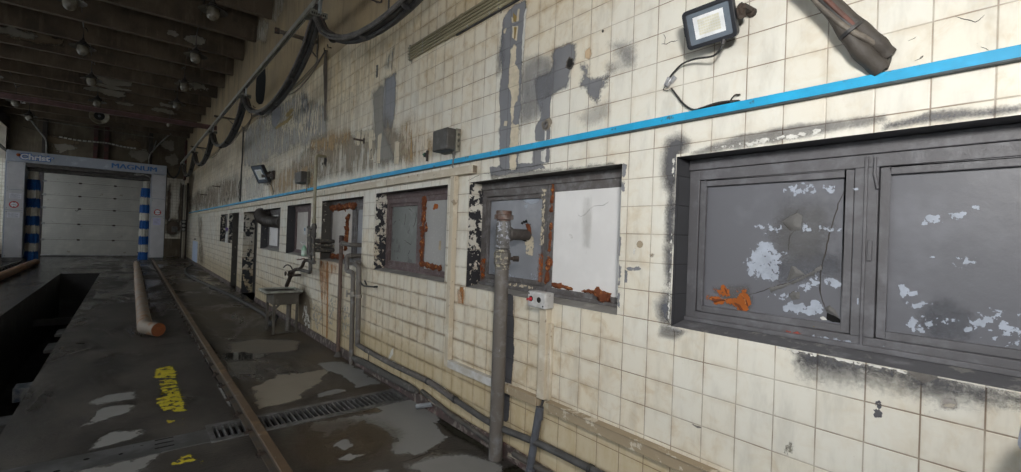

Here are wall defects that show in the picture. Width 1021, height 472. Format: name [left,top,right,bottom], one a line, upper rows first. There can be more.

peeling [504,8,527,147]
peeling [220,213,268,293]
peeling [374,194,387,269]
peeling [466,183,483,287]
rust [706,284,751,311]
peeling [743,224,852,343]